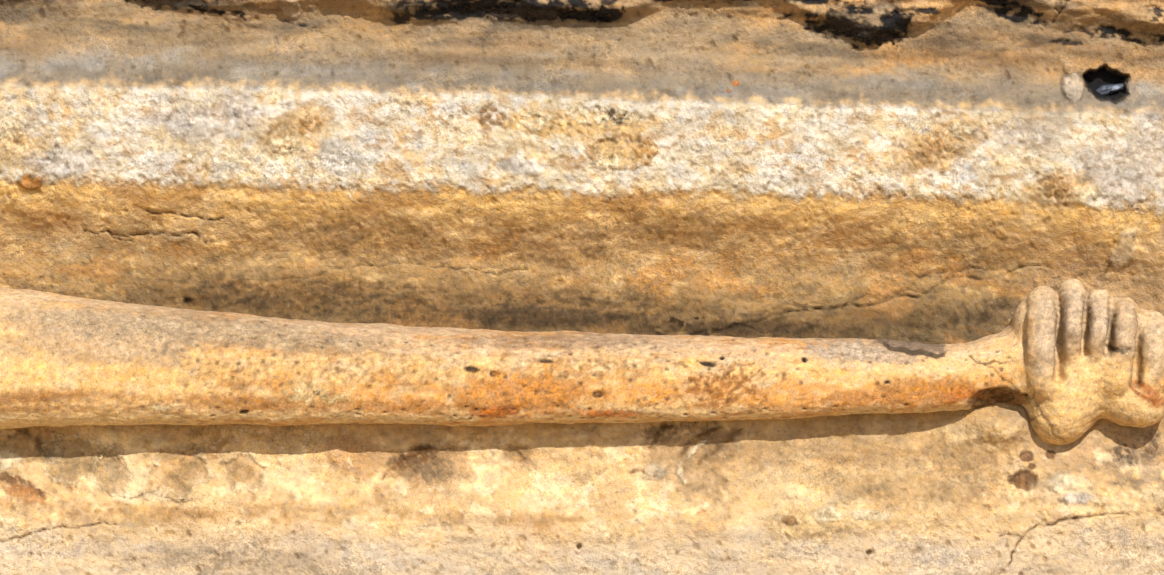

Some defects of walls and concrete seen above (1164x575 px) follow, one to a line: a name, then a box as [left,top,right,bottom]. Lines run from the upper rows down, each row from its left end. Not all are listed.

crack [1000,513,1122,563]